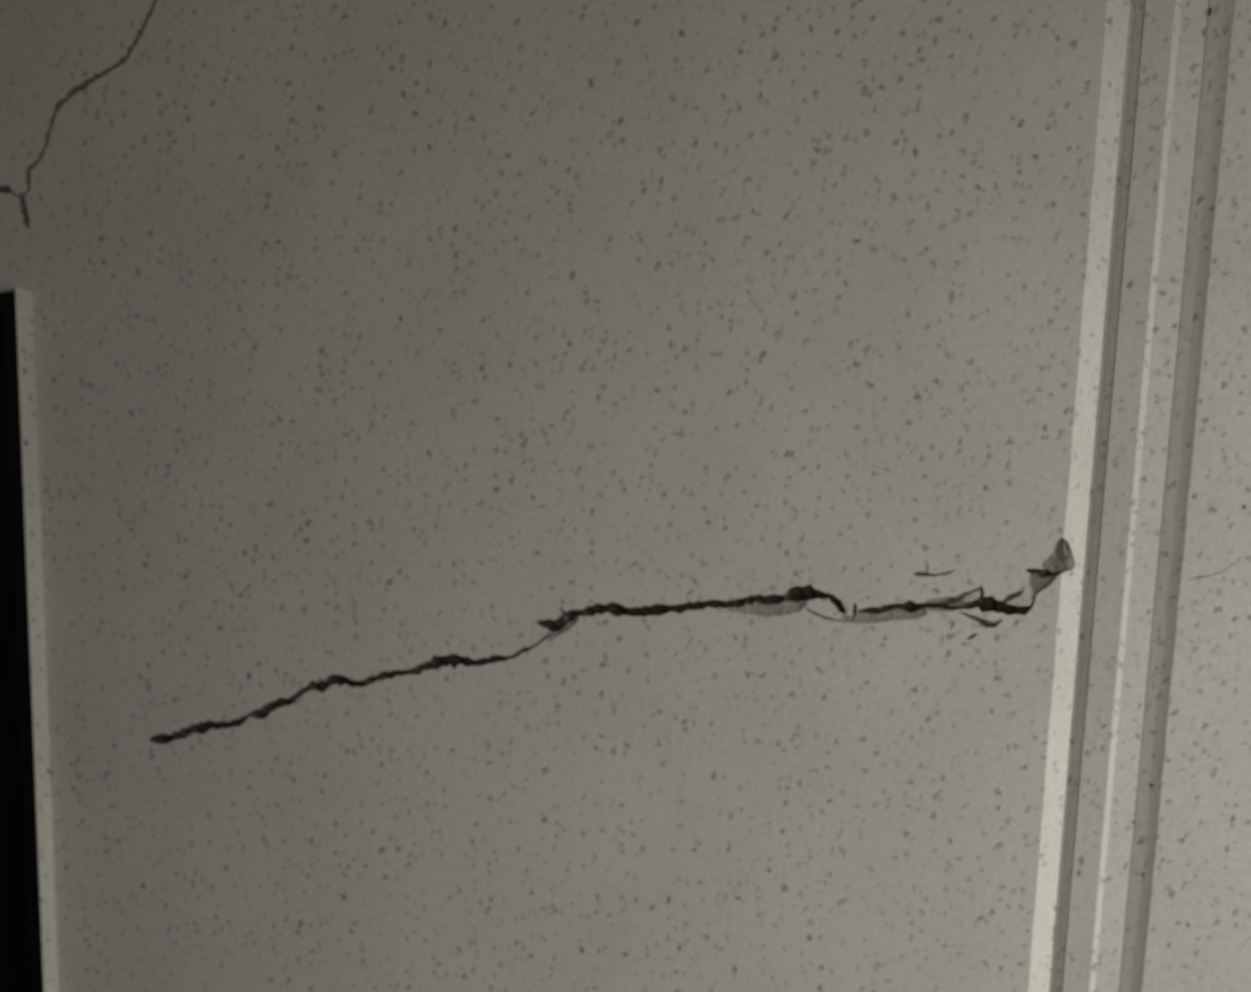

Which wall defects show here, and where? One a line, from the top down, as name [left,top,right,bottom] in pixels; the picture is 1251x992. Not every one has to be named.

crack [0,0,157,229]
crack [150,564,1036,744]